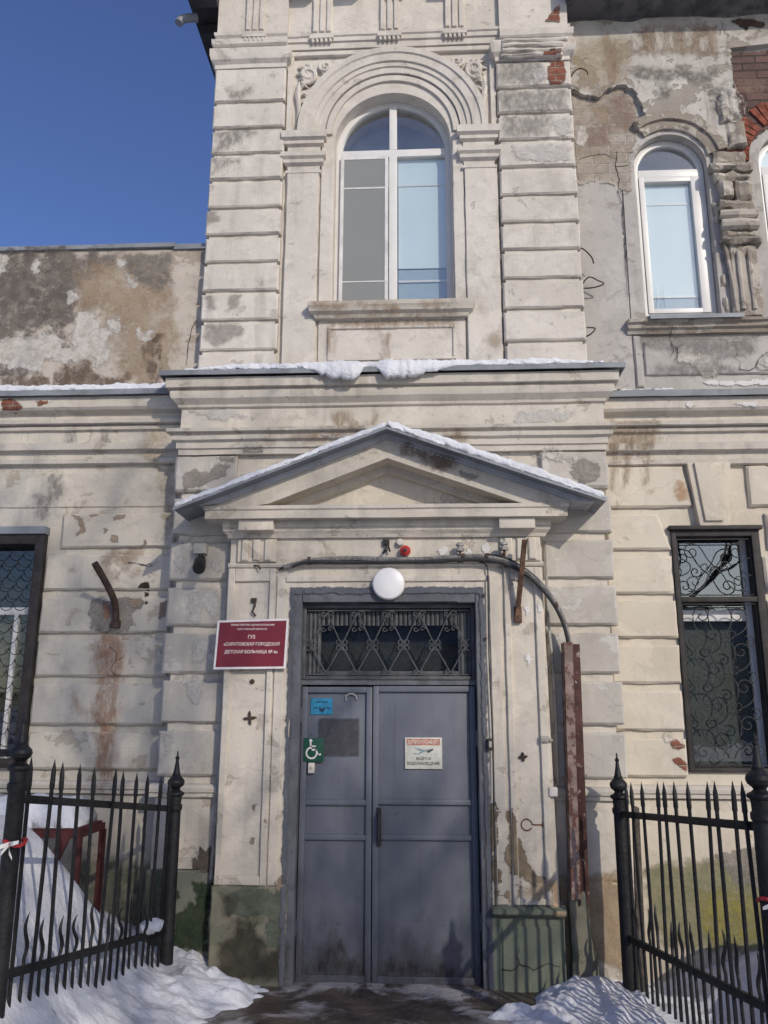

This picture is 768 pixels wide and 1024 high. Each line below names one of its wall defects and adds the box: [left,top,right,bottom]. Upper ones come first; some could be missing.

flaking render [545,6,560,22]
spalling [731,18,765,30]
flaking render [503,48,567,135]
flaking render [713,50,768,141]
peeling [0,252,9,273]
peeling [0,290,154,373]
flaking render [183,446,263,493]
flaking render [532,446,600,484]
peeling [73,514,98,536]
flaking render [88,582,167,634]
flaking render [483,802,554,902]
water stain [219,886,289,979]